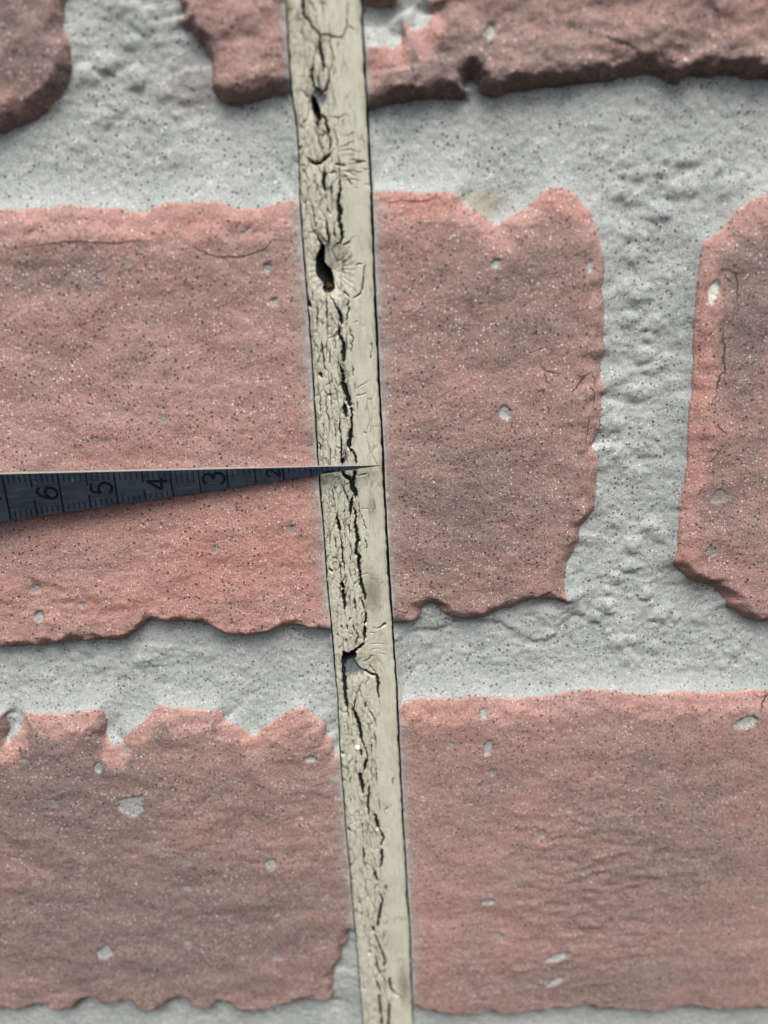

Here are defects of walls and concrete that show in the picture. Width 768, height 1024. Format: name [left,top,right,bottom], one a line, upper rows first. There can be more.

crack [184,0,445,1024]